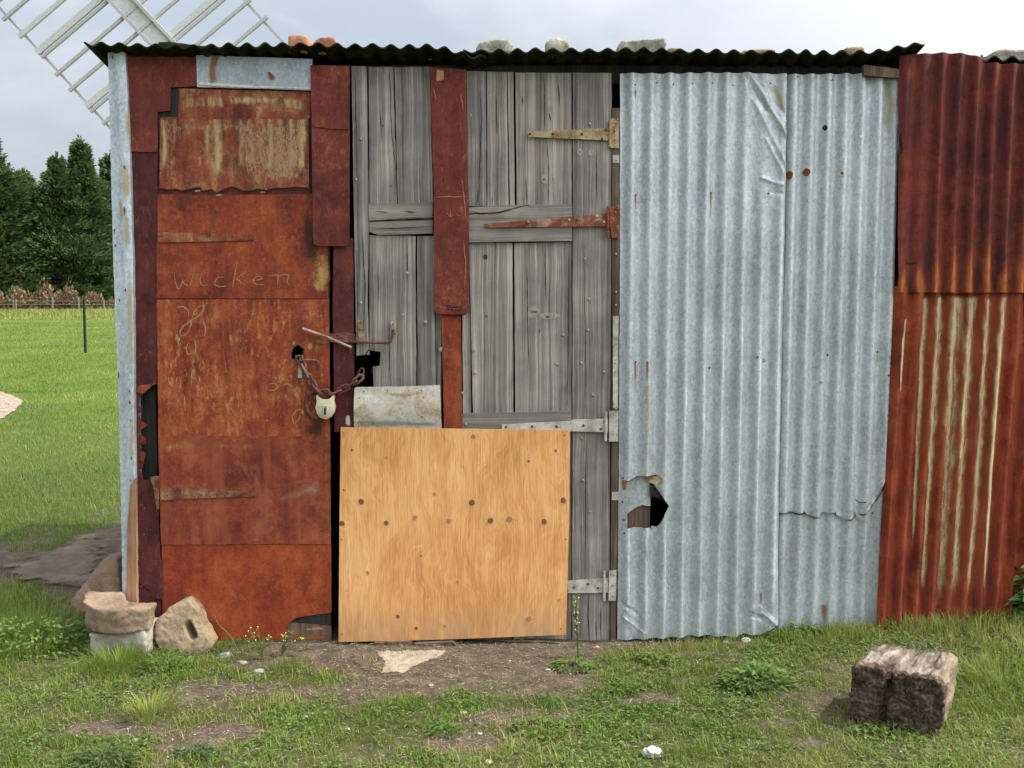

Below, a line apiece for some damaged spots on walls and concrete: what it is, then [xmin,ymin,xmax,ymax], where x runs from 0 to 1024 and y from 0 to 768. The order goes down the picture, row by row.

corrosion [114,152,312,560]
corrosion [786,167,811,181]
corrosion [872,52,1024,630]
corrosion [139,583,162,618]